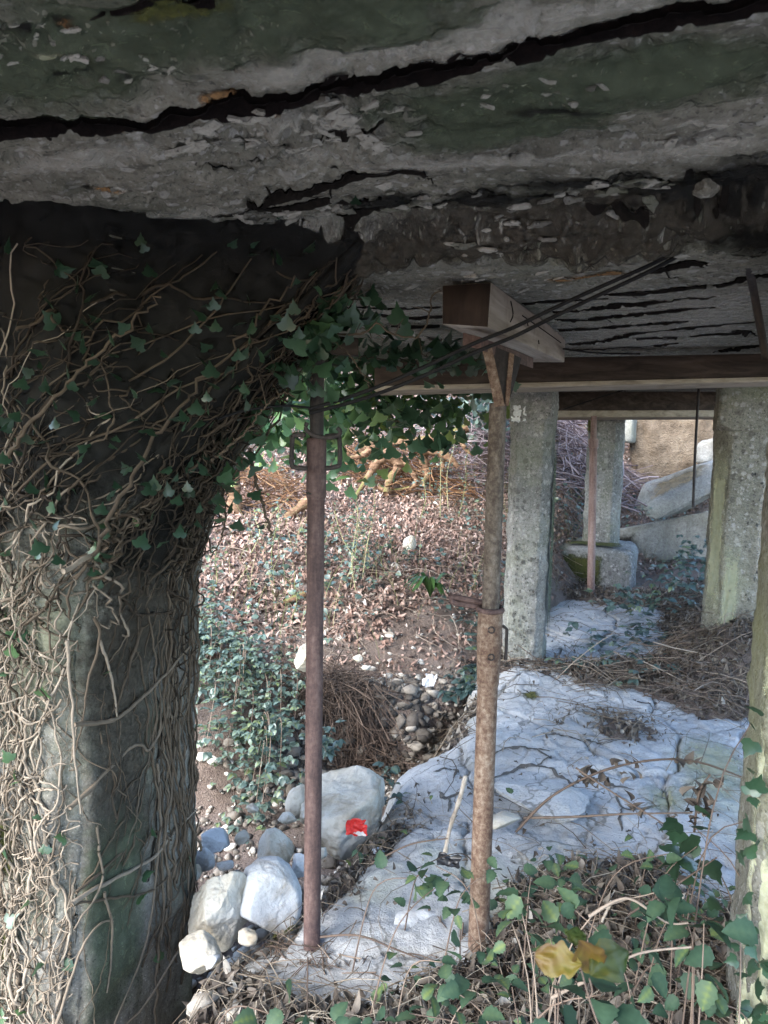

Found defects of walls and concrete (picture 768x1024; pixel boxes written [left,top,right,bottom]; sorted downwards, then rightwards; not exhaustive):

crack [0,0,768,142]
spalling [164,96,429,171]
crack [208,168,434,242]
spalling [233,170,452,226]
spalling [444,176,679,257]
spalling [607,251,725,281]
crack [510,260,768,353]